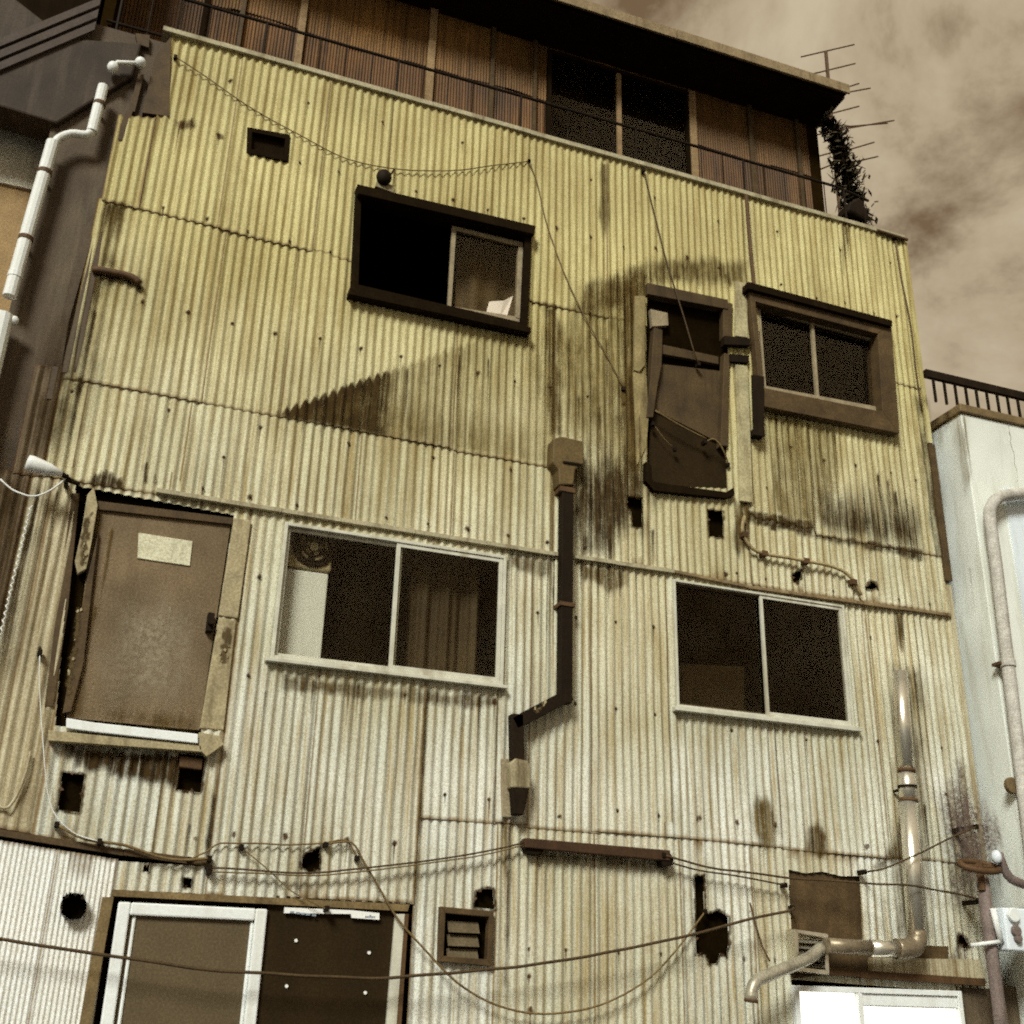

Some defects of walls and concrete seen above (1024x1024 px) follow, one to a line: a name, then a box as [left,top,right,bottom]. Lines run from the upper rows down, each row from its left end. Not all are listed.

rust [808,824,826,857]